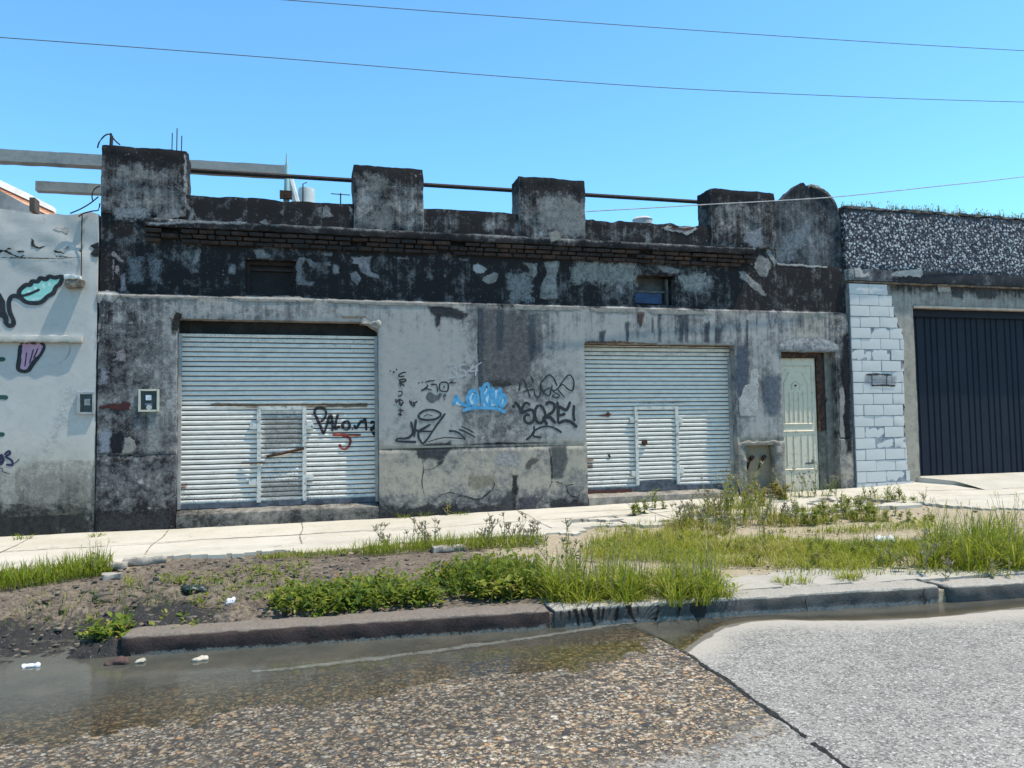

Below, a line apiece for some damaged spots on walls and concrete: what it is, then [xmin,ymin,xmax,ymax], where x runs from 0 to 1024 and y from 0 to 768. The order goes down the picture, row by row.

peeling [226,248,454,333]
peeling [460,258,487,274]
water stain [427,306,539,387]
peeling [738,369,759,417]
crack [422,462,502,500]
crack [549,449,582,498]